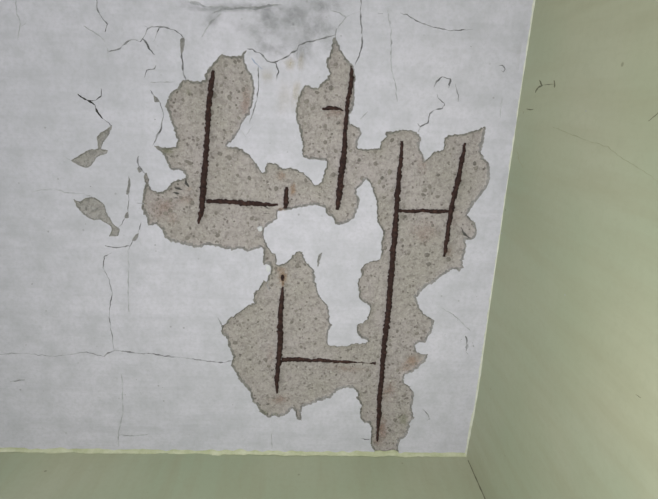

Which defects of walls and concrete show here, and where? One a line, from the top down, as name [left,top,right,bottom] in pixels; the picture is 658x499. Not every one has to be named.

peeling [71,126,112,168]
crack [78,90,112,126]
crack [84,0,186,144]
crack [241,0,363,137]
crack [379,13,473,102]
crack [418,77,459,131]
peeling [74,197,120,237]
spalling [137,37,490,452]
crack [0,224,231,363]